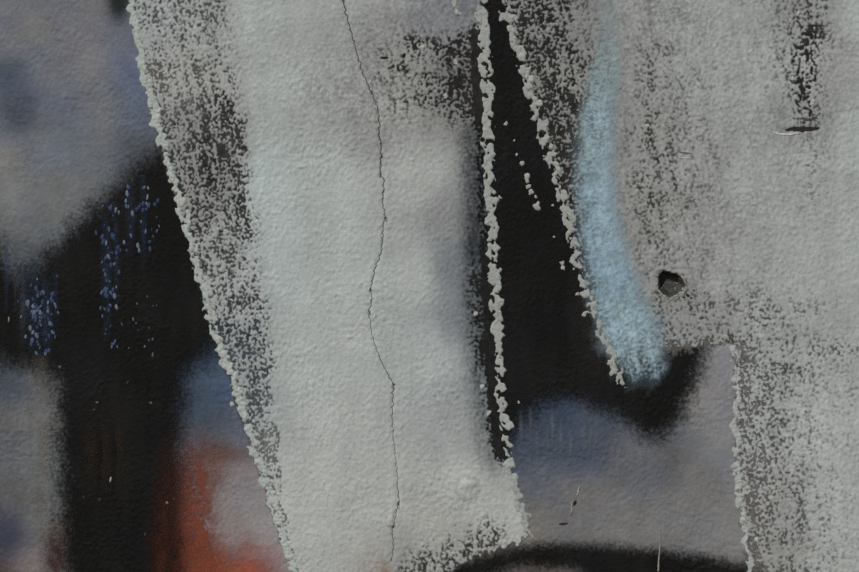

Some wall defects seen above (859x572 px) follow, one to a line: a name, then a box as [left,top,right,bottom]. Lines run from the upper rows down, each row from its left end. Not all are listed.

peeling [505,0,596,207]
spalling [17,278,59,356]
spalling [95,185,160,357]
peeling [137,62,281,492]
crack [342,0,400,558]
peeling [470,230,509,462]
hole [656,269,695,299]